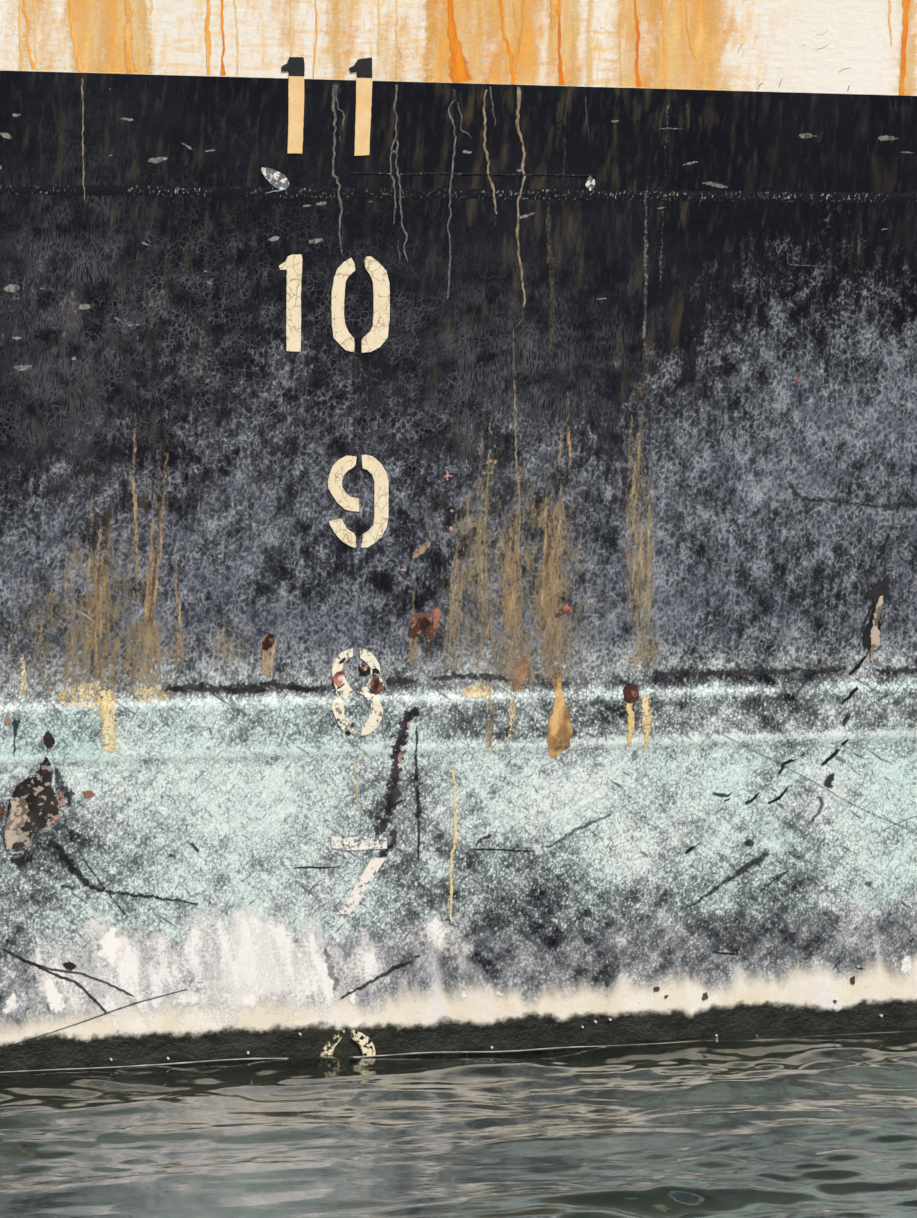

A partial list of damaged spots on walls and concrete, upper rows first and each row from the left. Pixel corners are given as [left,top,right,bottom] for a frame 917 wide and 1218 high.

corrosion [18,0,51,70]
corrosion [66,0,153,74]
corrosion [544,188,564,357]
corrosion [19,454,185,753]
corrosion [408,455,583,758]
corrosion [625,417,661,667]
peeling [0,731,96,869]
corrosion [623,683,654,751]